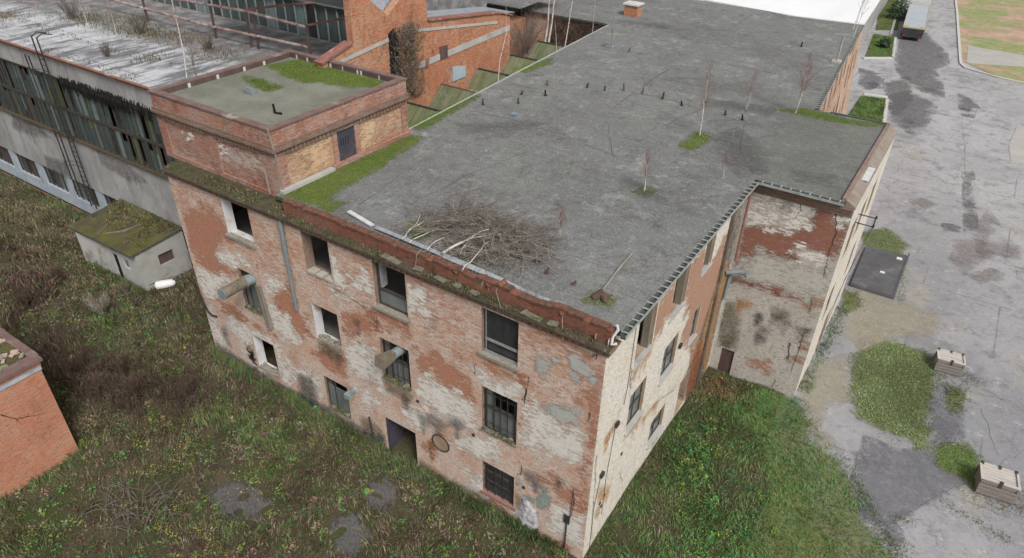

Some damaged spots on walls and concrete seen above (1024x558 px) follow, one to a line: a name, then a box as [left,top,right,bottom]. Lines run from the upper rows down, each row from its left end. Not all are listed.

flaking render [218,144,264,171]
flaking render [182,200,604,551]
flaking render [734,193,851,310]
crack [772,214,837,390]